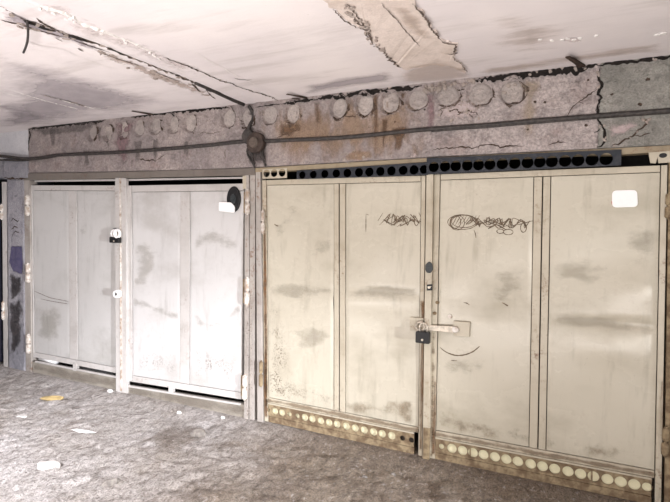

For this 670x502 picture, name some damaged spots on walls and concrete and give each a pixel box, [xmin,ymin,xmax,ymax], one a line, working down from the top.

water stain [16,80,126,123]
crack [2,7,422,127]
peeling [324,0,476,94]
peeling [437,100,481,122]
crack [438,55,670,147]